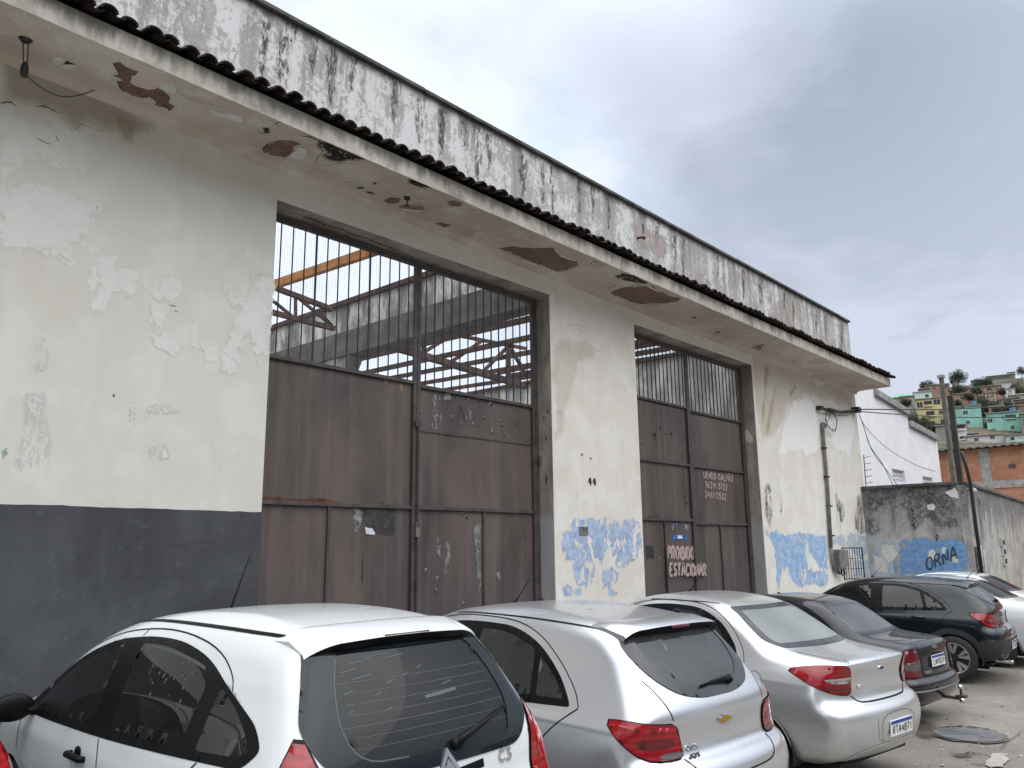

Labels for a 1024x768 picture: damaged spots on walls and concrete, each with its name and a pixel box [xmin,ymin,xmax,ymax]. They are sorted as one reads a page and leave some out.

peeling [110,62,177,111]
water stain [259,22,298,85]
water stain [309,38,338,105]
water stain [309,137,363,166]
water stain [438,110,446,153]
water stain [460,120,491,180]
peeling [0,97,149,315]
peeling [498,246,578,272]
water stain [616,273,647,284]
peeling [608,284,680,304]
peeling [561,517,642,596]
peeling [766,530,970,588]